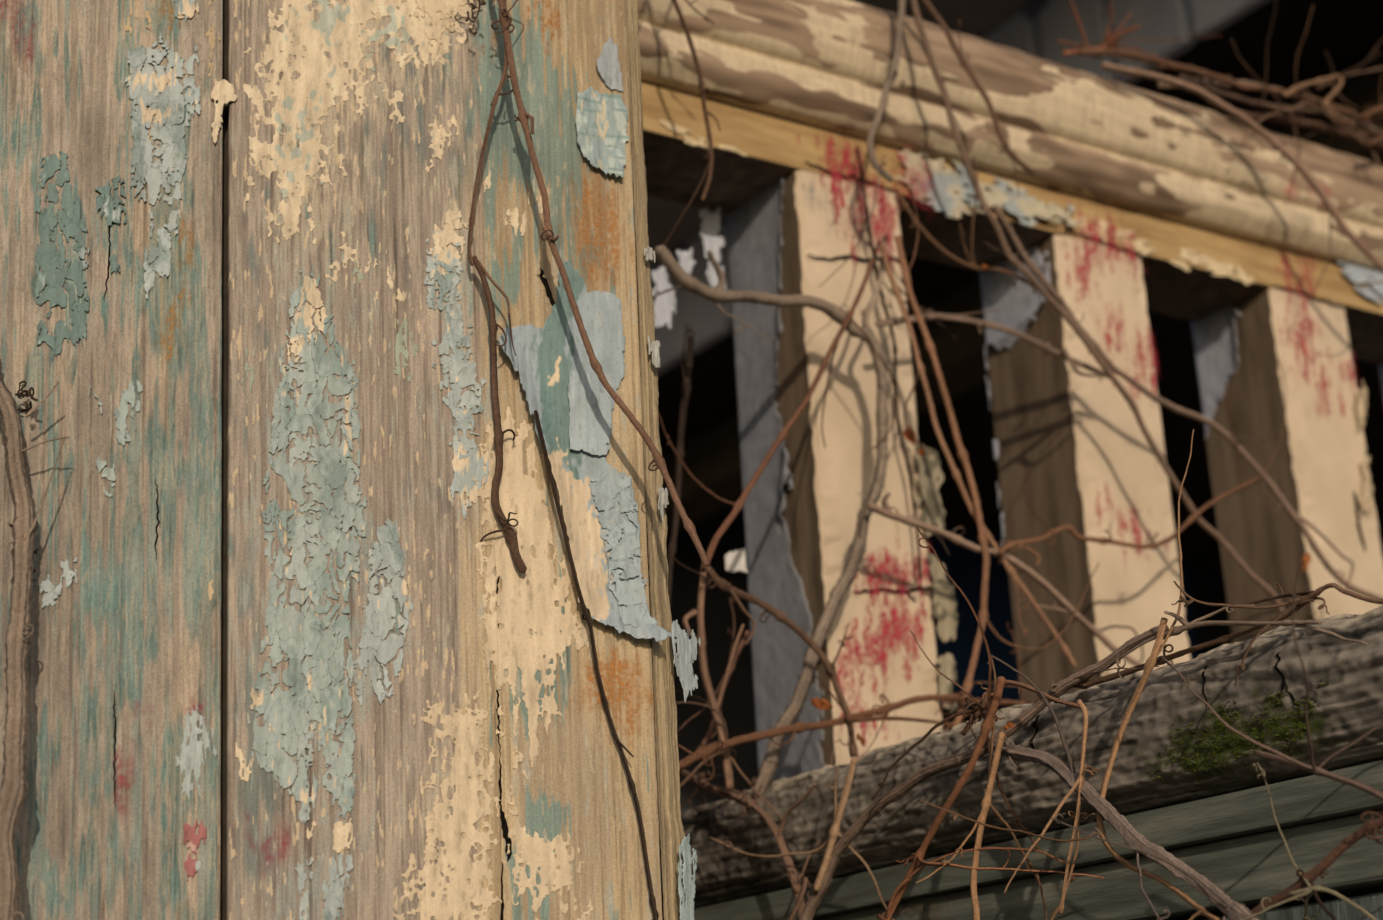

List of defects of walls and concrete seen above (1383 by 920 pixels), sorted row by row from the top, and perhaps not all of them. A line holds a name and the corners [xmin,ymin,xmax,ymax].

peeling [34,0,496,361]
peeling [575,37,629,178]
peeling [638,0,1383,304]
peeling [979,246,1051,411]
peeling [1191,303,1241,439]
peeling [1356,364,1383,430]
peeling [1359,455,1374,515]
peeling [235,208,701,920]
peeling [175,703,218,799]
crack [1030,714,1041,749]
crack [1200,665,1208,708]
crack [1274,652,1305,722]